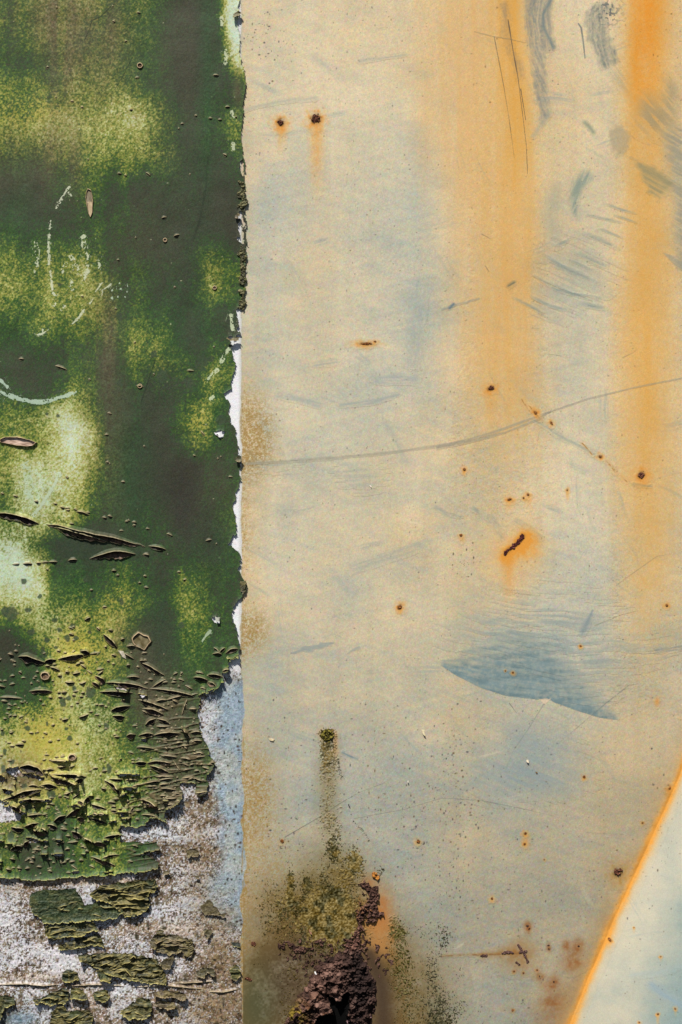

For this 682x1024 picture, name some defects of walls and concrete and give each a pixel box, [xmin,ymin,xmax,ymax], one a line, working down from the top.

peeling [233,0,242,65]
rust [267,101,334,200]
rust [343,338,388,352]
rust [509,0,682,1024]
peeling [0,308,246,1024]
rust [392,597,408,618]
rust [284,872,384,1024]
damp [243,733,479,1024]